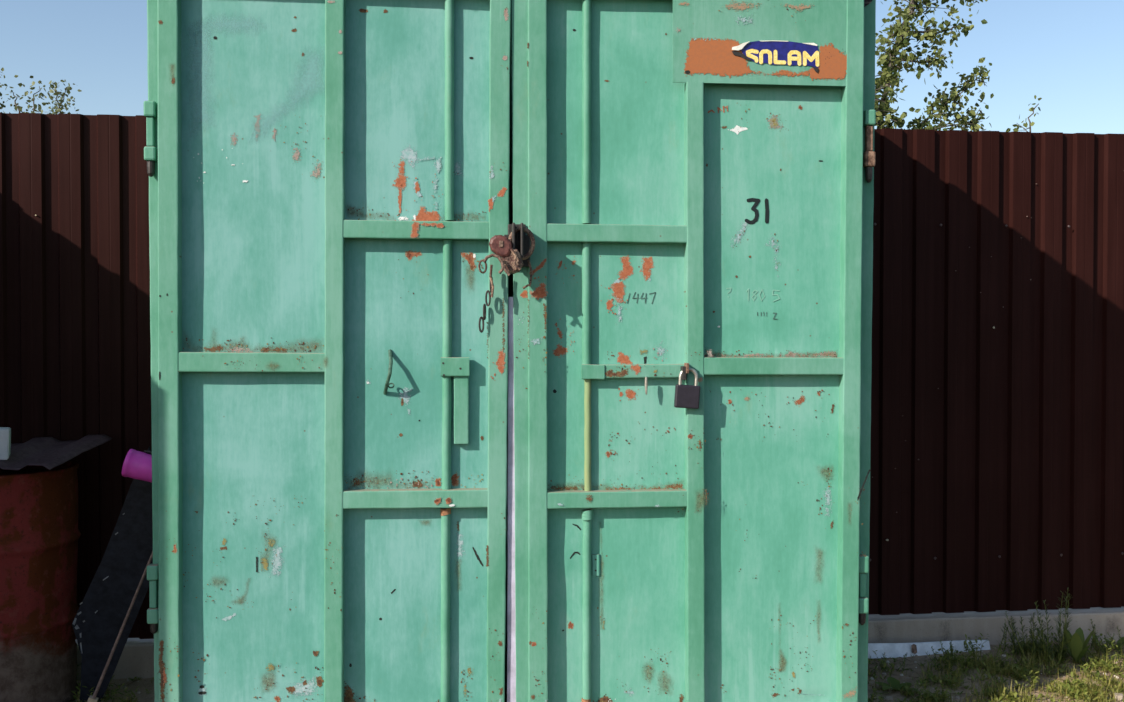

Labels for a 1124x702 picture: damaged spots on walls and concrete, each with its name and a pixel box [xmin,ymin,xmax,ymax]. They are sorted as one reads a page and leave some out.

peeling [665,27,847,81]
corrosion [183,338,326,371]
corrosion [344,470,483,489]
corrosion [344,681,376,702]